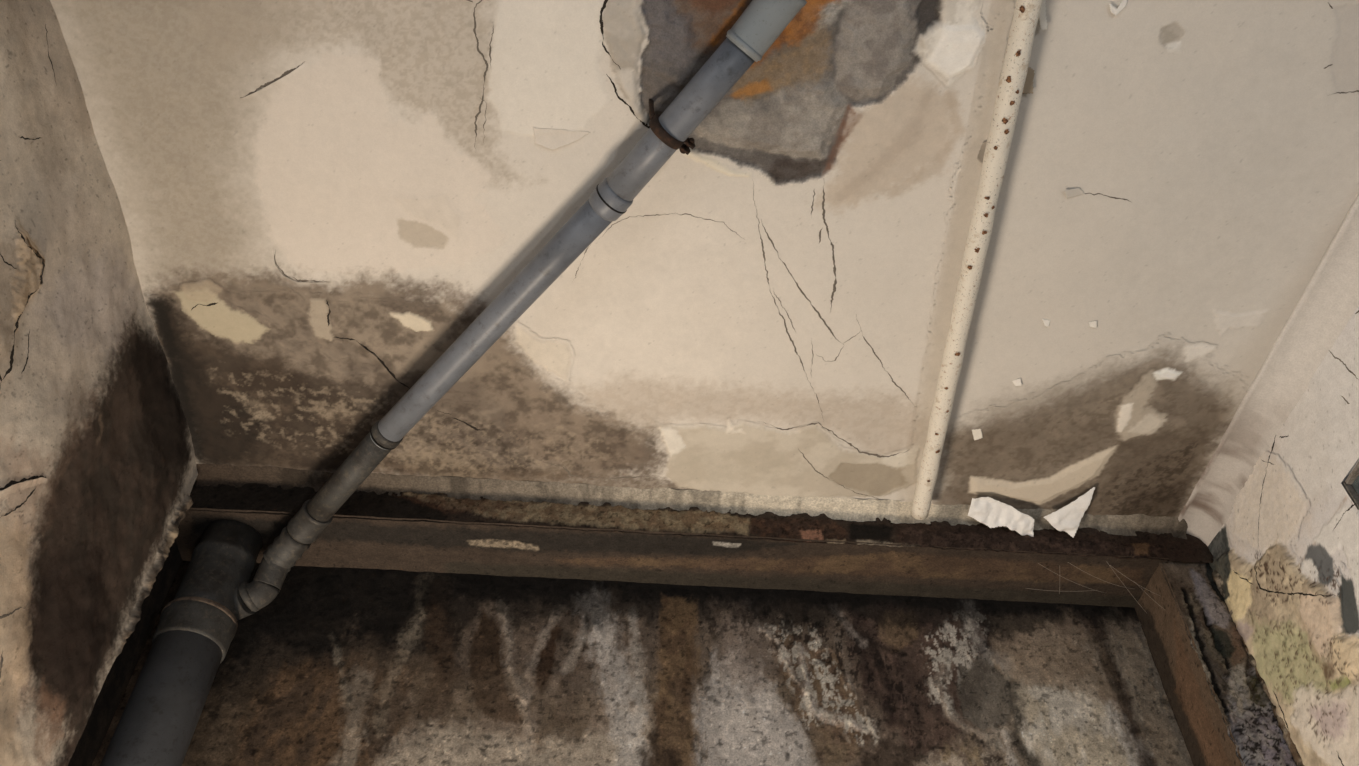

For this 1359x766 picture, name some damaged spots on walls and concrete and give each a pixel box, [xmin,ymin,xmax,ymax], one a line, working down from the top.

crack [467,0,494,149]
peeling [483,0,709,140]
crack [599,0,650,128]
corrosion [666,0,752,58]
corrosion [724,0,844,103]
spalling [681,0,990,188]
corrosion [994,76,1019,150]
water stain [18,257,492,766]
crack [574,187,916,499]
water stain [931,333,1249,517]
water stain [209,566,1190,766]
spalling [1179,451,1359,766]